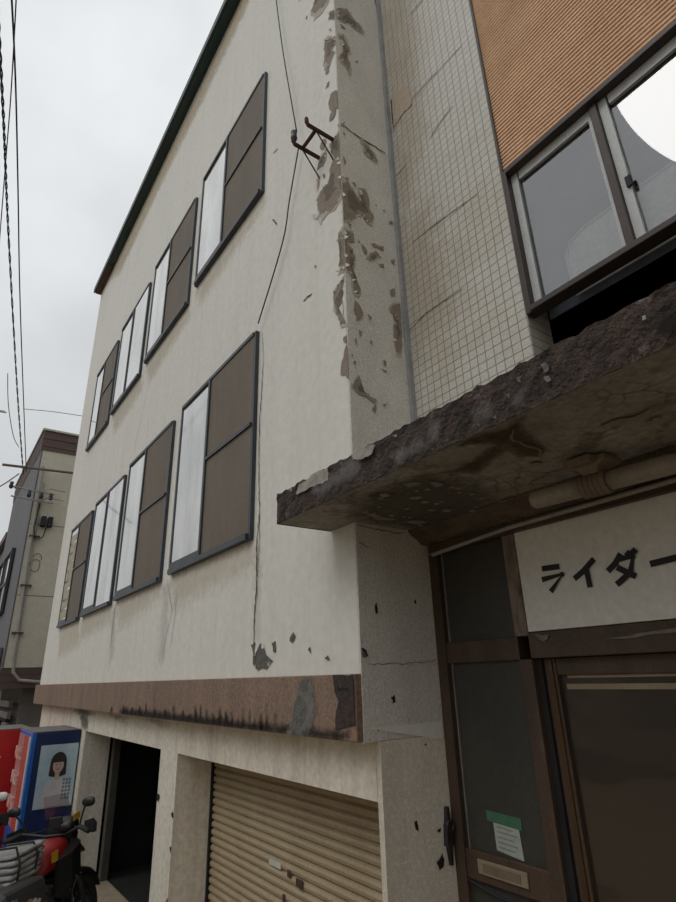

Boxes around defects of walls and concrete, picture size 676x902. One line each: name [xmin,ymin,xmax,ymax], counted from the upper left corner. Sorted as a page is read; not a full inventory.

peeling [305,0,395,413]
peeling [388,289,403,357]
peeling [289,468,329,494]
peeling [351,444,375,460]
damp [353,420,544,528]
spalling [251,641,276,671]
damp [110,705,345,740]
peeling [287,678,315,735]
spalling [332,674,355,741]